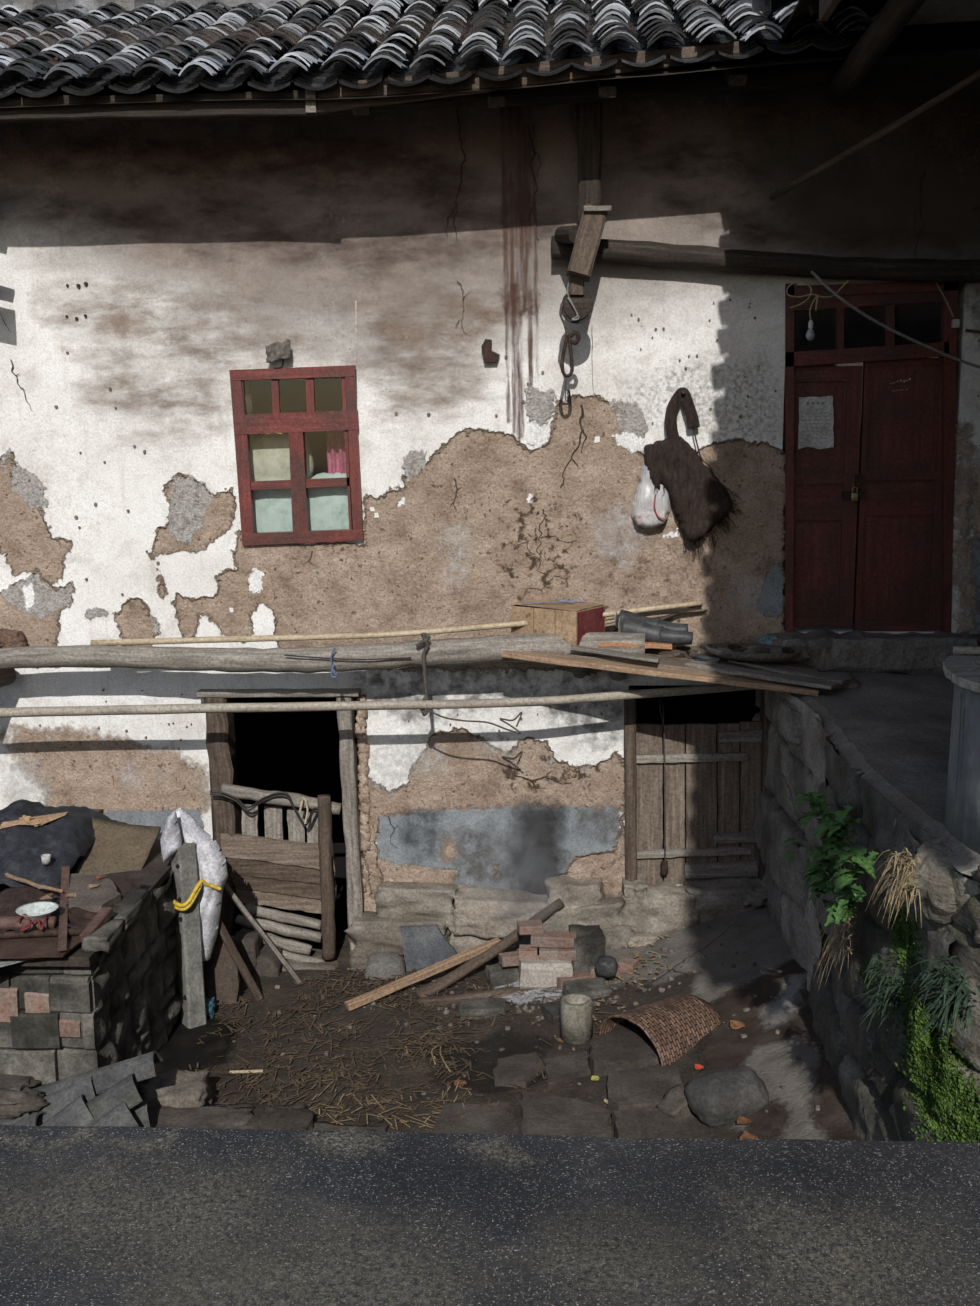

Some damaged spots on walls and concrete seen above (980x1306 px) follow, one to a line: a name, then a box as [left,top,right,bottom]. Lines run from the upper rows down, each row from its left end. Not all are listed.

damp [251,224,294,246]
corrosion [500,106,538,441]
flaking render [0,448,88,646]
flaking render [85,371,785,648]
crack [506,405,587,595]
flaking render [952,423,980,634]
flaking render [0,722,212,814]
flaking render [387,662,602,676]
flaking render [356,714,638,912]